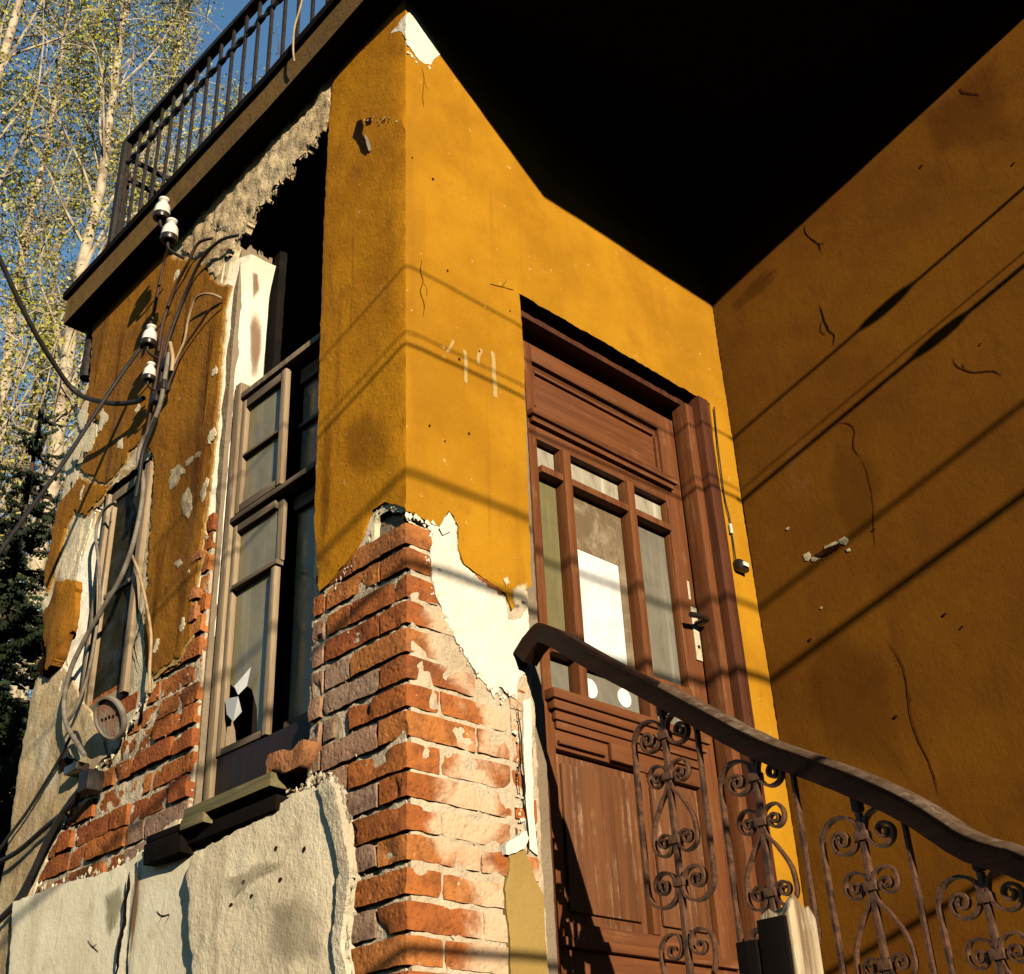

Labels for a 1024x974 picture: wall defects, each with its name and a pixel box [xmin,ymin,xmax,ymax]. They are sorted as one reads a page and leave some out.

hole [353,116,397,154]
crack [820,307,835,343]
crack [953,359,1002,376]
flaking render [35,76,333,894]
peeling [803,536,851,562]
crack [887,640,939,795]
flaking render [285,506,548,974]